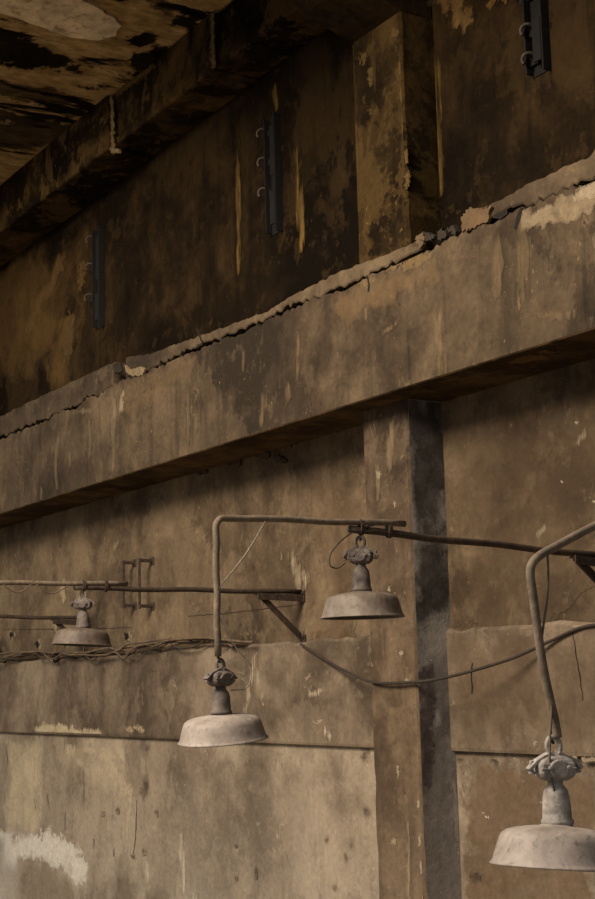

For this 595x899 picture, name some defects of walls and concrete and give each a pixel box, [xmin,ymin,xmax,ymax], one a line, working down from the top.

peeling [0,0,122,41]
peeling [432,0,475,47]
peeling [358,49,373,88]
leakage [434,52,446,198]
peeling [403,148,412,191]
leakage [293,144,307,254]
crack [494,207,522,229]
crack [190,324,257,351]
flaking render [0,823,90,887]